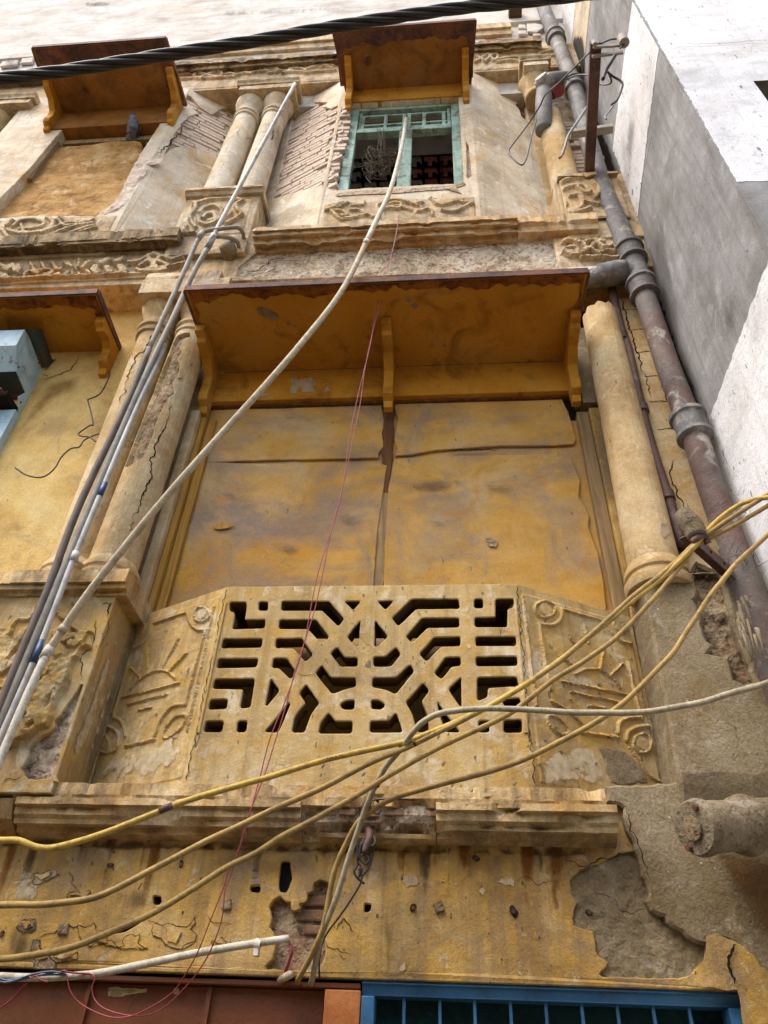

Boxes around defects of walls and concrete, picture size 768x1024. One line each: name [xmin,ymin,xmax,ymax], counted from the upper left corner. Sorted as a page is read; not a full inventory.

crack [156,118,188,155]
crack [119,335,152,400]
crack [621,297,651,396]
crack [129,406,172,531]
crack [669,460,684,507]
flaking render [690,566,751,685]
flaking render [24,659,111,783]
peeling [546,747,648,786]
rust [521,847,534,878]
flaking render [267,863,333,971]
flaking render [570,853,768,1024]